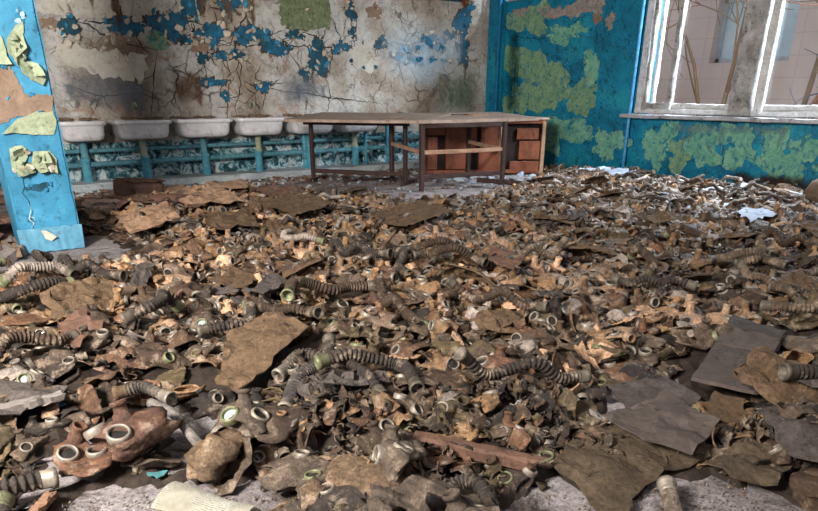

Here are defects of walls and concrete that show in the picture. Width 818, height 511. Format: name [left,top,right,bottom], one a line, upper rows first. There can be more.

spalling [513,0,616,38]
crack [72,14,420,117]
peeling [38,0,476,118]
spalling [454,162,608,188]
spalling [627,178,750,210]